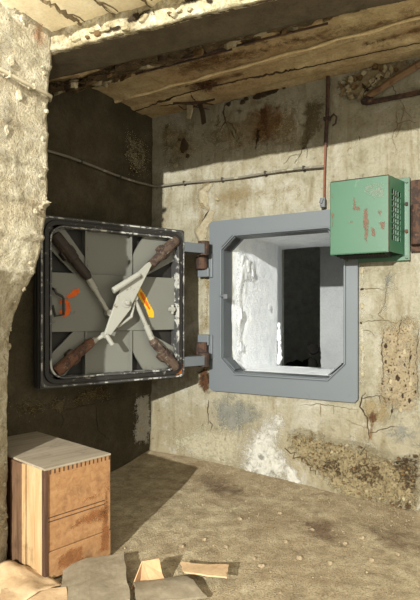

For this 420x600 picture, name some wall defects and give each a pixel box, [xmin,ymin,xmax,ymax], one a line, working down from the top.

crack [40,0,85,26]
crack [94,0,118,16]
spalling [48,10,360,96]
crack [134,43,420,140]
spalling [337,60,416,100]
leakage [217,99,324,163]
corrosion [198,368,210,393]
flaking render [378,315,420,413]
leakage [170,396,301,483]
crack [304,394,394,437]
spalling [285,431,420,513]